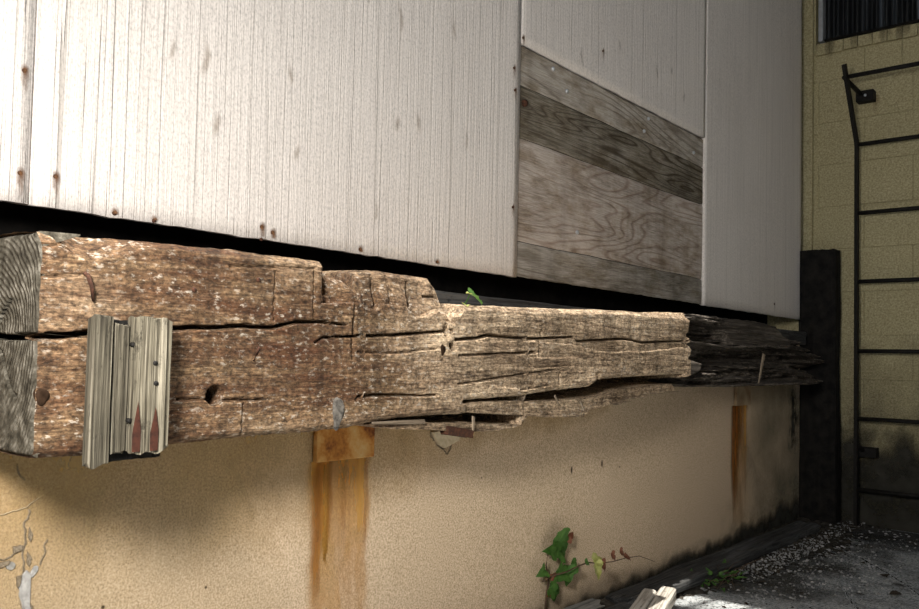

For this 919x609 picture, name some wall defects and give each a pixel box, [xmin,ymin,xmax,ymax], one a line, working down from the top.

crack [0,508,48,609]
rust [310,457,366,588]
rust [732,405,747,491]
damp [840,437,919,534]